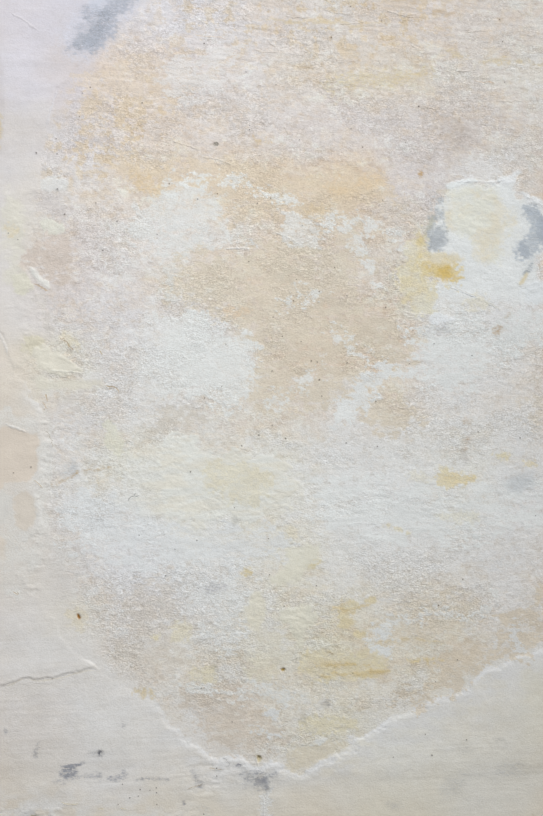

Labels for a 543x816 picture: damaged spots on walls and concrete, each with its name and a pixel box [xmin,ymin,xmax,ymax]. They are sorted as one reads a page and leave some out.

water stain [45,0,160,74]
peeling [56,49,193,145]
water stain [27,182,78,224]
peeling [23,225,82,291]
water stain [388,190,499,341]
water stain [510,201,543,287]
peeling [155,211,423,429]
water stain [197,455,281,529]
water stain [402,463,483,533]
water stain [61,604,94,635]
peeling [0,582,543,816]
water stain [238,594,447,792]